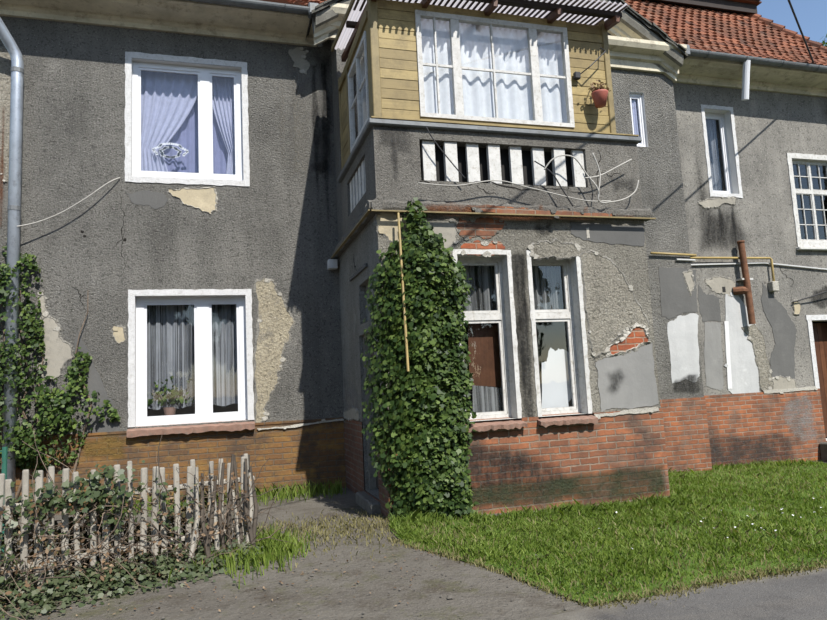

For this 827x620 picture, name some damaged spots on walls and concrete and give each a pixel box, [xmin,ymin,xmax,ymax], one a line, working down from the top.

peeling [288,47,310,75]
crack [113,197,126,278]
flaking render [168,186,218,215]
flaking render [374,204,618,258]
water stain [703,208,742,247]
flaking render [111,324,127,345]
flaking render [253,276,295,423]
flaking render [527,238,652,358]
flaking render [683,269,744,296]
peeling [724,321,732,389]
flaking render [741,324,798,394]
flaking render [792,299,801,316]